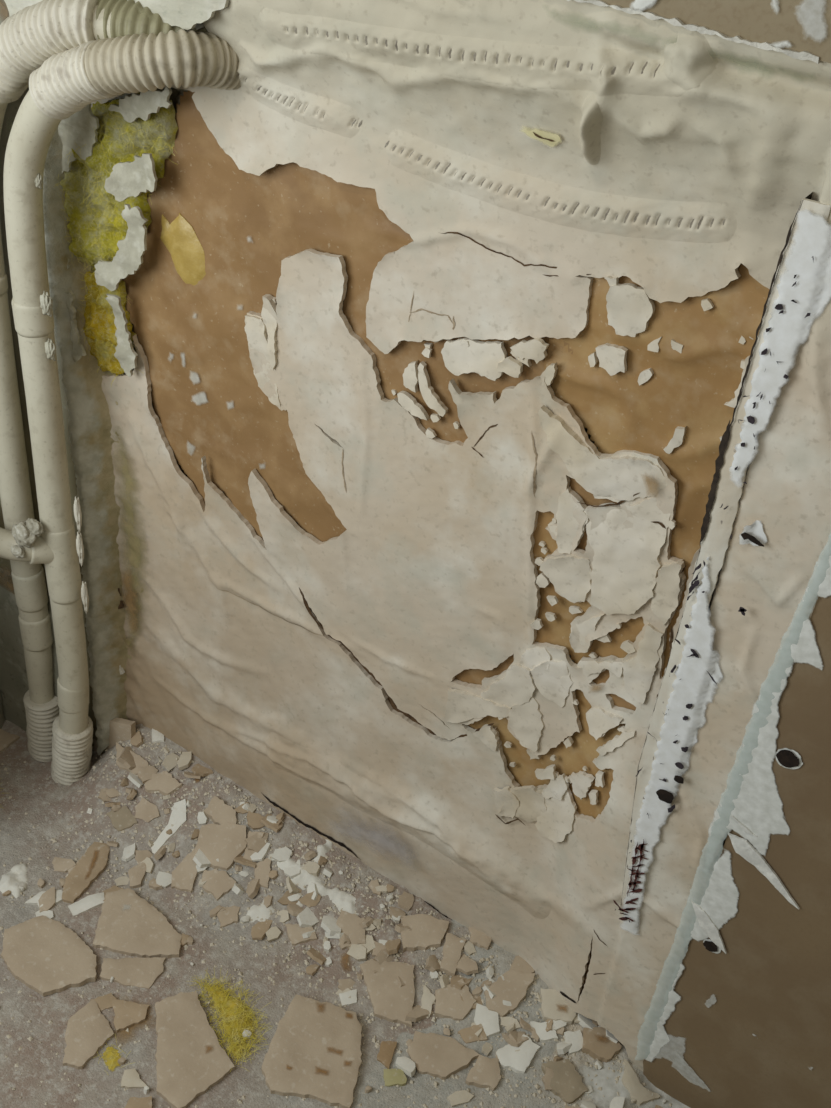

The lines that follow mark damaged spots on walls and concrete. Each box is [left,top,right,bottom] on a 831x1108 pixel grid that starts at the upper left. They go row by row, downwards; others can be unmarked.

crack [438,232,591,277]
flaking render [43,127,132,755]
water stain [118,444,142,646]
flaking render [123,90,770,843]
crack [216,587,494,740]
crack [560,931,608,1003]